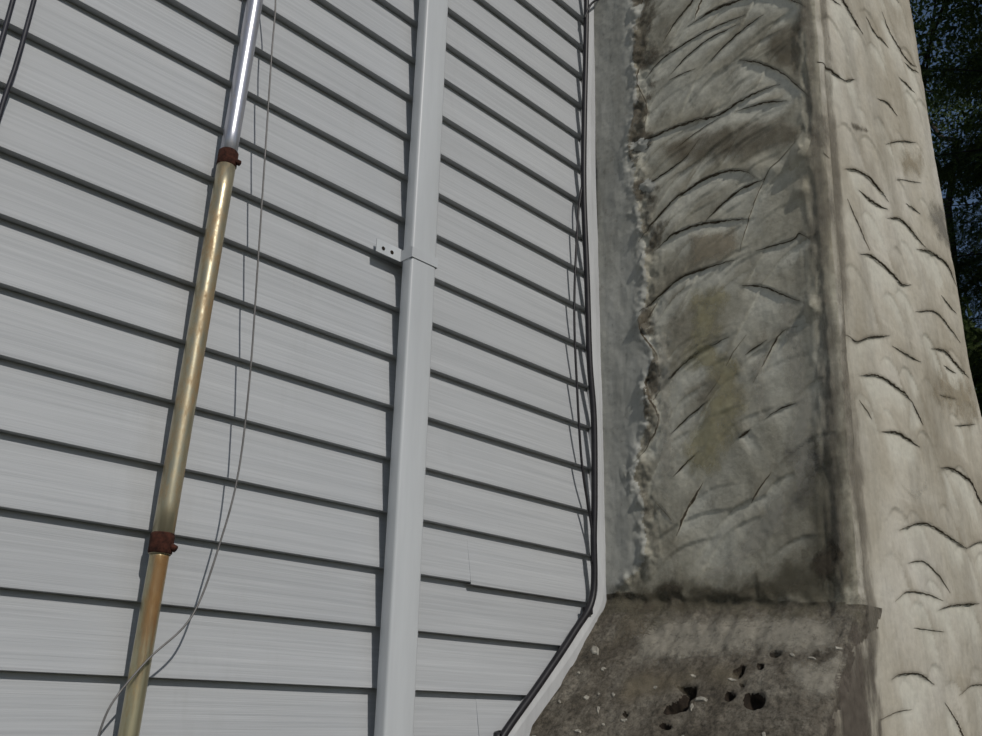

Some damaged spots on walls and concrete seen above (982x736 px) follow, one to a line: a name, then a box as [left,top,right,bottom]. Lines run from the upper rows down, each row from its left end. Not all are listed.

crack [627,0,808,182]
crack [817,62,854,81]
crack [834,0,917,92]
crack [823,150,965,374]
crack [638,142,809,457]
crack [859,374,923,446]
crack [943,467,982,503]
crack [902,522,982,548]
crack [897,560,979,632]
spalling [639,614,847,711]
spalling [659,674,708,730]
crack [893,672,982,736]